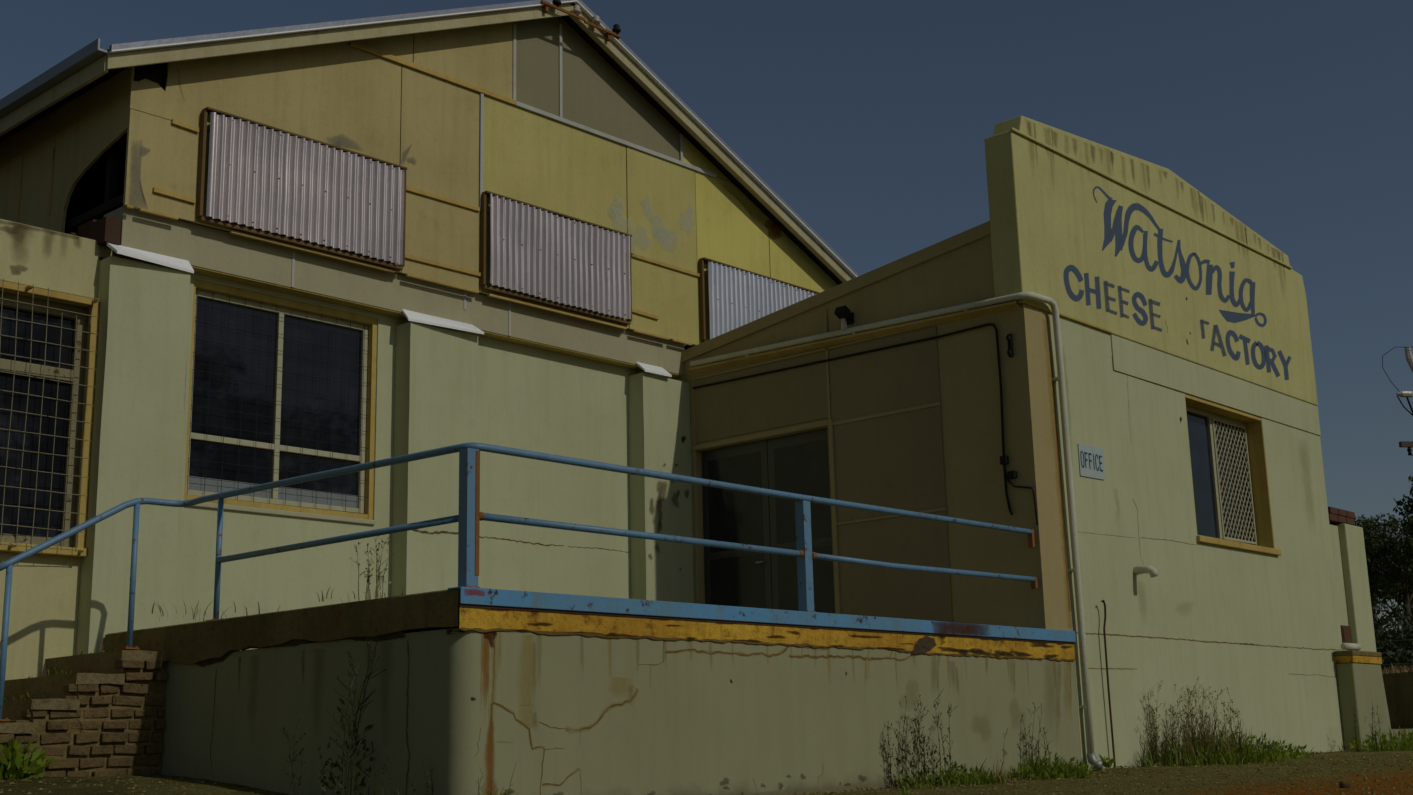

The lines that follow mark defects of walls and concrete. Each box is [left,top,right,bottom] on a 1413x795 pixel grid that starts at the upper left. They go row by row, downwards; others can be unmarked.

crack [415,529,629,553]
spalling [480,631,497,647]
spalling [912,636,1071,658]
crack [475,637,909,795]